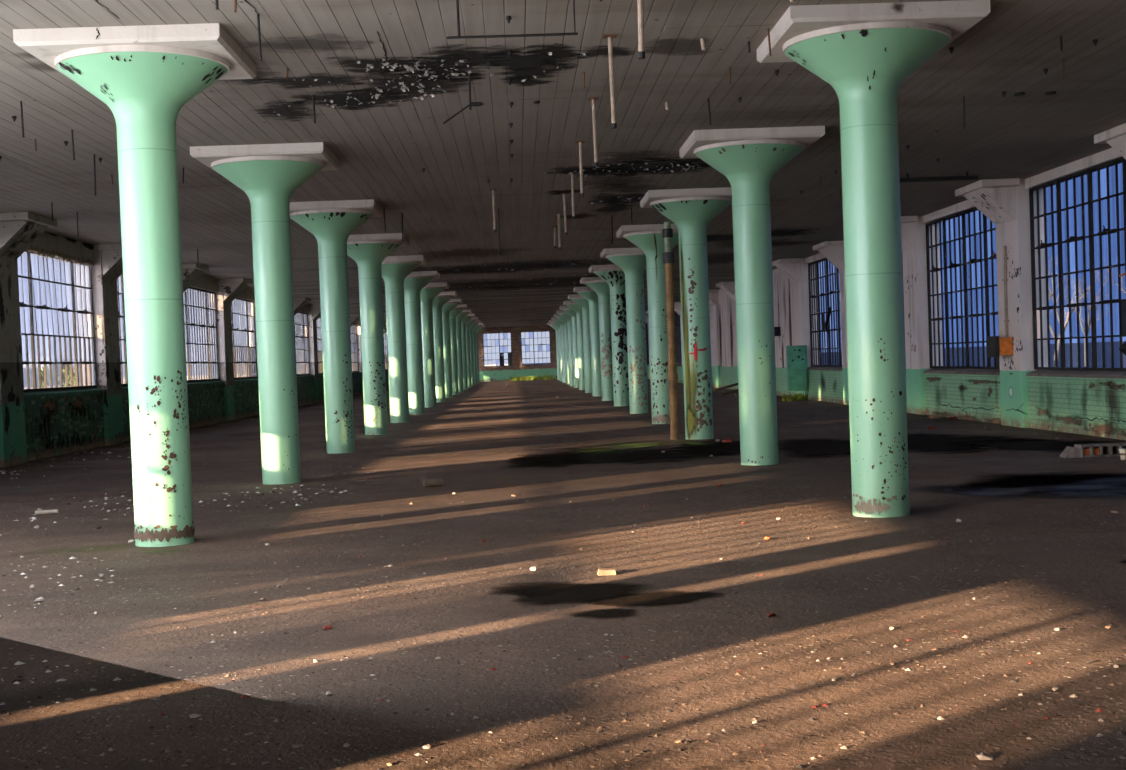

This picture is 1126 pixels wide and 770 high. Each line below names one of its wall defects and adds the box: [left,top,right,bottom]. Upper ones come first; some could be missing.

peeling [601,271,670,424]
peeling [688,258,698,350]
peeling [137,370,187,498]
peeling [692,365,712,432]
leakage [778,438,851,458]
peeling [852,391,907,515]
leakage [907,433,1111,454]